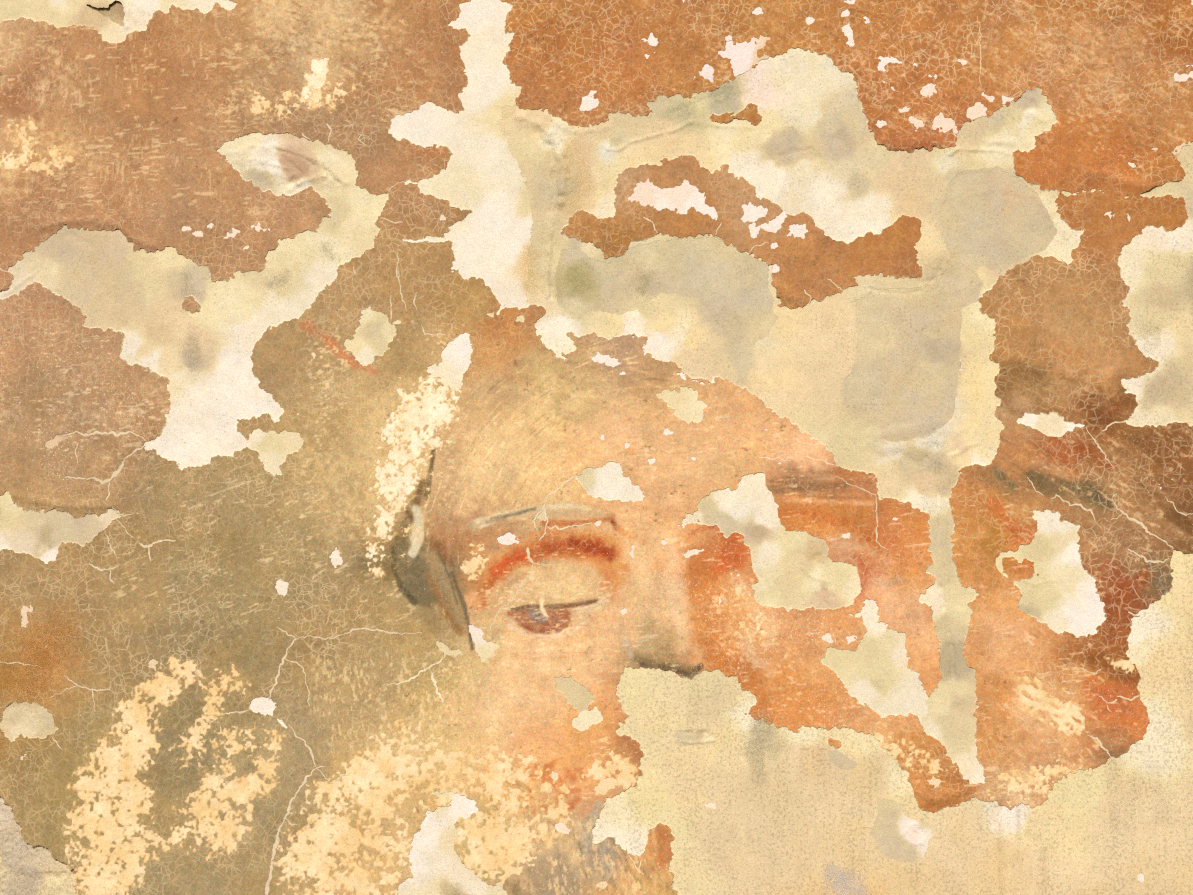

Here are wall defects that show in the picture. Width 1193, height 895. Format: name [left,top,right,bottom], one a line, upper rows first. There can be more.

peeling [0,0,237,44]
peeling [1174,64,1193,82]
peeling [0,55,389,476]
peeling [344,305,401,366]
peeling [365,332,473,577]
peeling [388,0,1105,573]
peeling [1104,140,1193,427]
crack [2,662,112,710]
peeling [0,656,288,895]
crack [220,627,422,895]
crack [387,657,444,701]
peeling [269,472,1193,895]